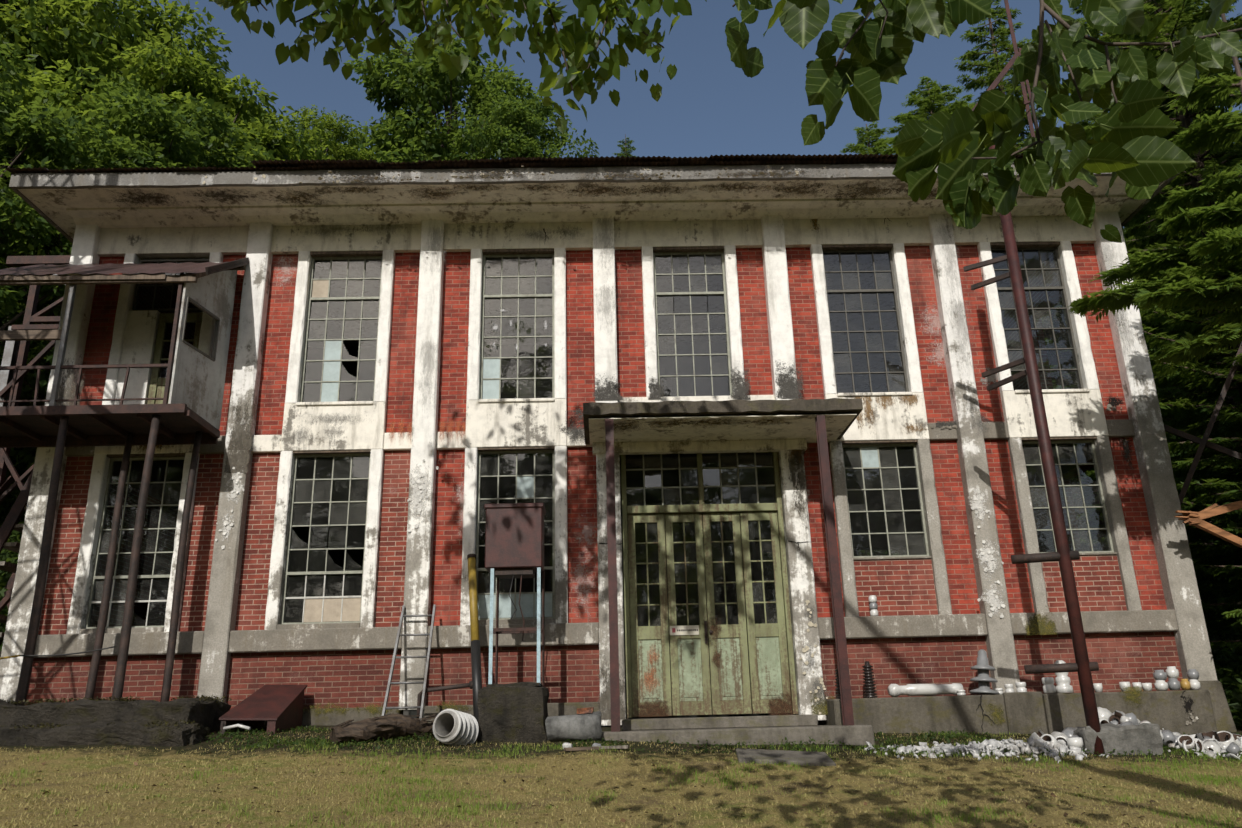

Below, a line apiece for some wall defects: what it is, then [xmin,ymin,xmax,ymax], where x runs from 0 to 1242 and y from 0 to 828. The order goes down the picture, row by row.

damp [648,378,664,399]
damp [730,363,750,400]
damp [775,361,804,399]
damp [225,399,255,473]
corrosion [638,650,668,717]